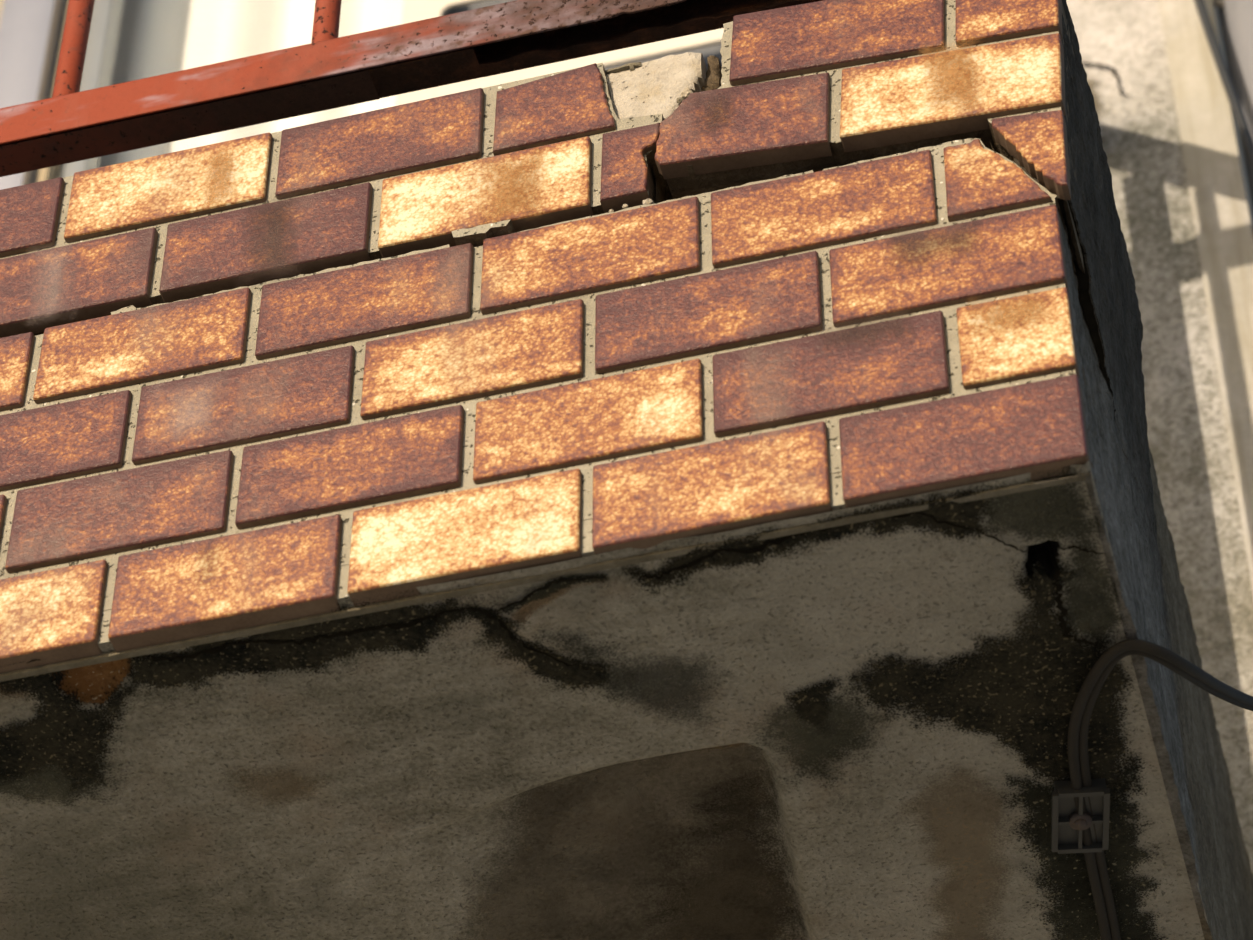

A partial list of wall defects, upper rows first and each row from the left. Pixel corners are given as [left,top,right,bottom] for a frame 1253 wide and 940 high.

spalling [605,52,722,120]
rust [933,48,972,103]
crack [982,141,995,152]
crack [609,162,838,213]
crack [451,219,515,247]
crack [111,305,138,315]
crack [1058,199,1116,421]
crack [132,527,832,670]
crack [890,512,1105,649]
leakage [0,466,1127,940]
leakage [1088,663,1177,940]